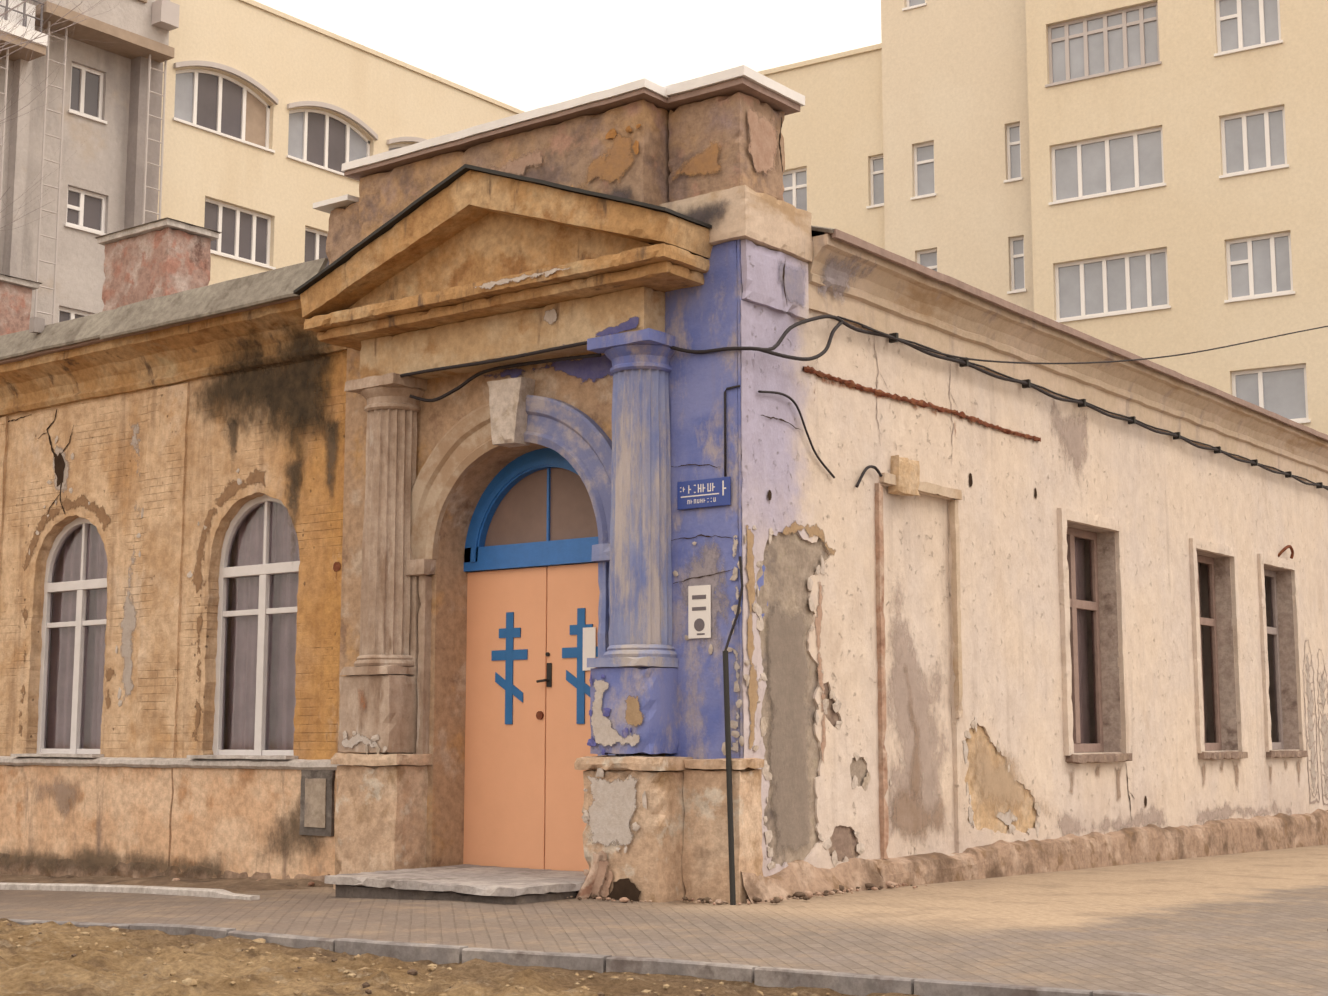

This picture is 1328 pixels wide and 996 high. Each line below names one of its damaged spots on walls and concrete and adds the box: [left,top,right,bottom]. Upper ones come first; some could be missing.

spalling [571,124,641,188]
spalling [748,108,783,174]
crack [8,409,74,521]
water stain [197,329,338,542]
spalling [673,521,865,870]
peeling [576,674,647,902]
spalling [962,716,1041,838]